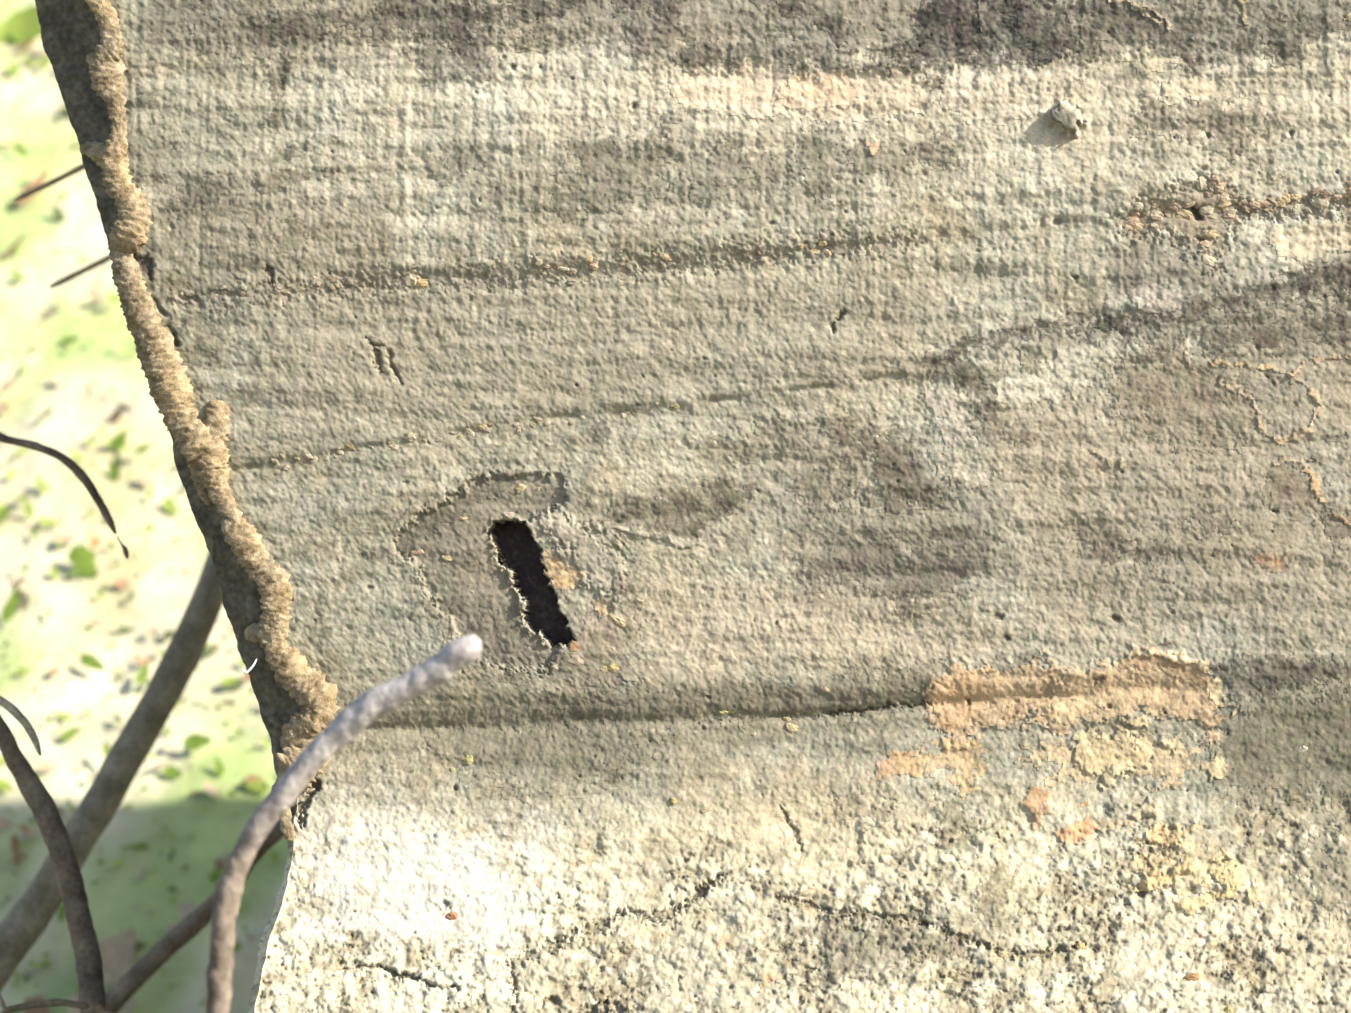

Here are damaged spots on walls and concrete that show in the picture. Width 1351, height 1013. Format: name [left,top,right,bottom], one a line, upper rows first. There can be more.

leakage [181,0,1351,194]
leakage [127,120,238,220]
leakage [535,107,969,226]
leakage [243,212,322,260]
leakage [592,251,1351,623]
spalling [382,456,656,714]
flaking render [1072,711,1151,752]
flaking render [1201,750,1229,782]
crack [335,963,460,991]
crack [505,874,726,1012]
crack [773,893,1087,960]
flaking render [1182,851,1266,916]